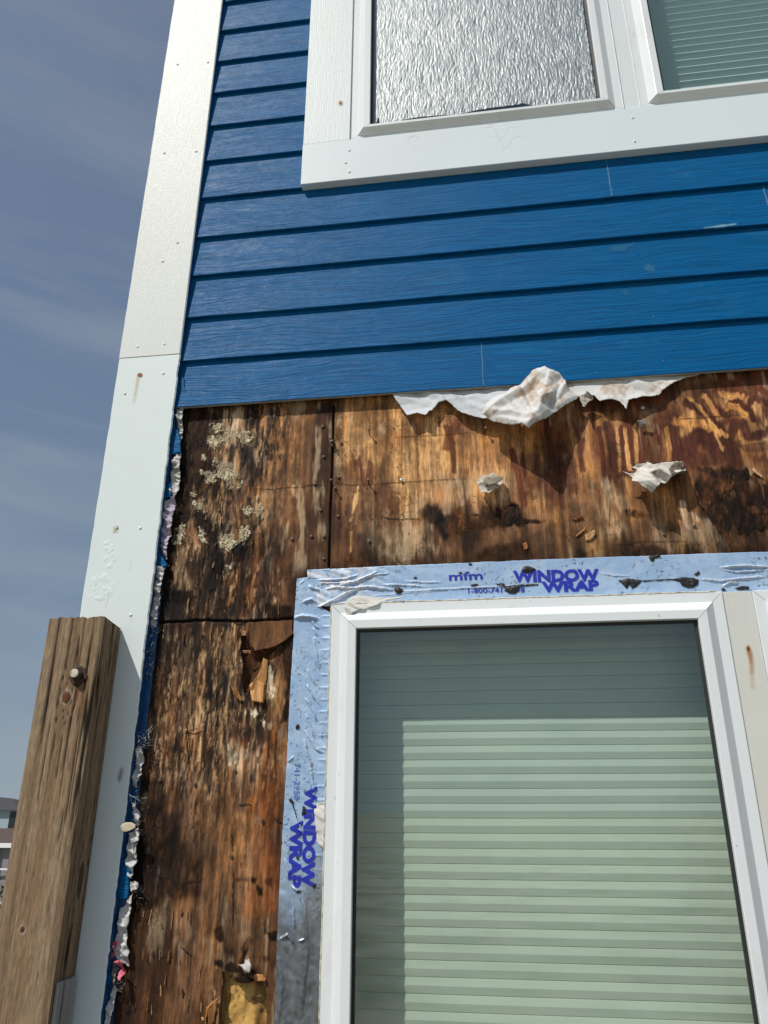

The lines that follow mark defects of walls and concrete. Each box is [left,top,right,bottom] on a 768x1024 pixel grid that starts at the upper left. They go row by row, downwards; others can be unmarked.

leakage [175,410,244,591]
leakage [422,503,541,538]
leakage [694,464,768,553]
leakage [477,544,527,562]
leakage [622,545,661,556]
leakage [163,559,196,602]
leakage [265,598,291,621]
peeling [229,581,293,718]
leakage [244,635,293,730]
leakage [129,776,198,918]
leakage [214,926,224,942]
leakage [214,942,254,989]